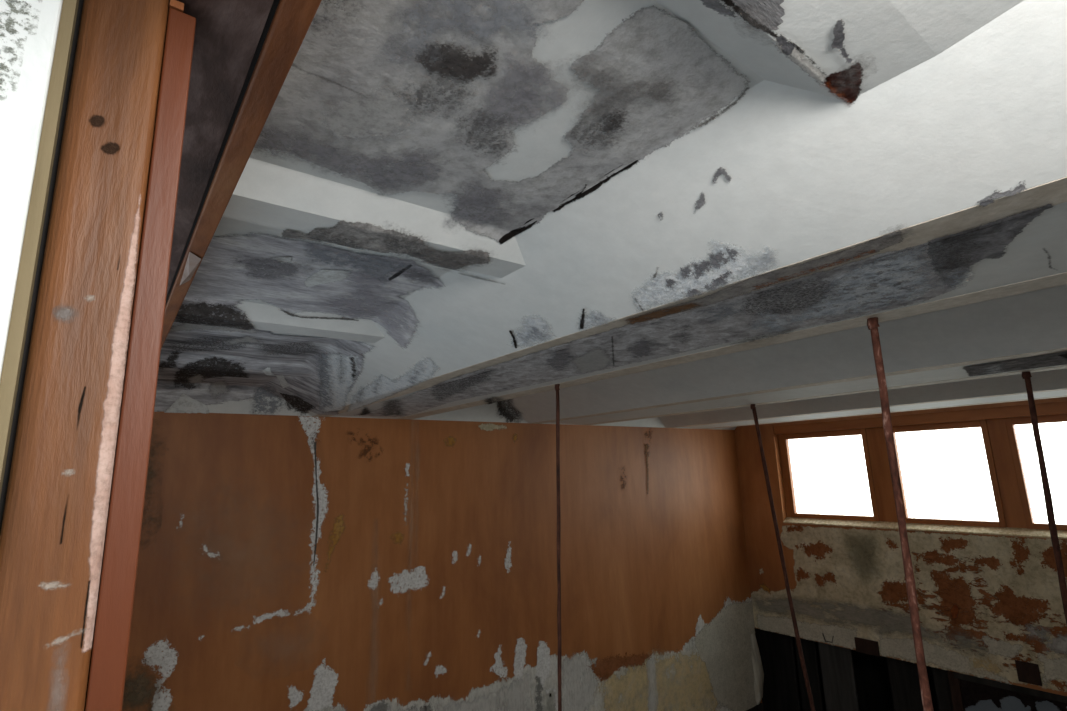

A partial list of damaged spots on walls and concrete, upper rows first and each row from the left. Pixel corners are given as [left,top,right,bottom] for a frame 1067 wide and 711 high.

mould [0,0,32,97]
peeling [254,0,750,242]
spalling [701,0,827,85]
peeling [831,20,854,64]
rust [822,62,863,104]
crack [499,160,638,244]
peeling [977,180,1027,207]
damp [319,353,359,412]
peeling [154,204,1067,632]
peeling [364,525,1067,711]
peeling [125,637,178,711]
peeling [287,658,346,711]